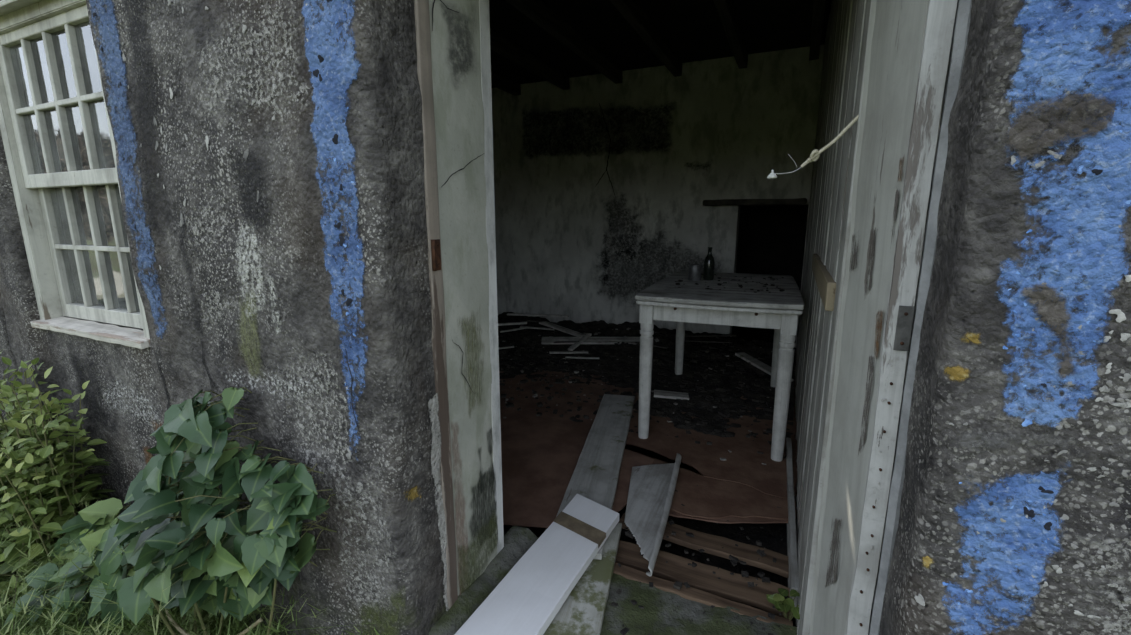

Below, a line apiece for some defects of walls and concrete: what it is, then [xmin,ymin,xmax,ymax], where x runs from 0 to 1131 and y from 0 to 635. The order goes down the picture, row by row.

peeling [197,0,394,610]
flaking render [428,393,449,611]
damp [456,428,497,594]
peeling [942,0,1131,635]